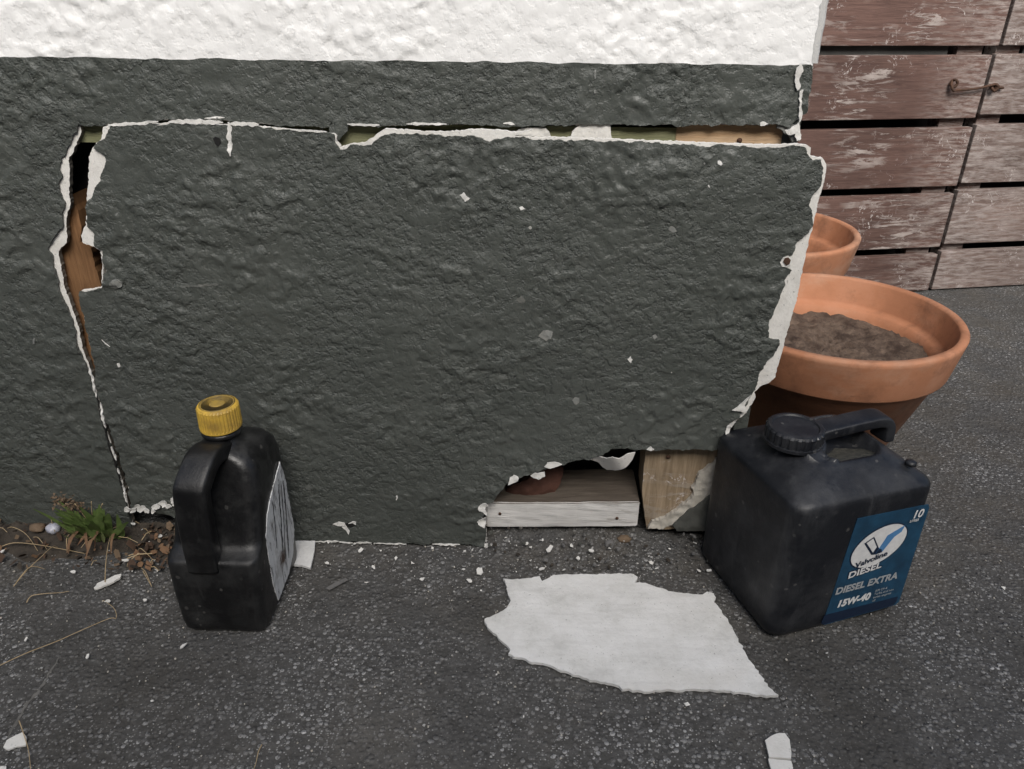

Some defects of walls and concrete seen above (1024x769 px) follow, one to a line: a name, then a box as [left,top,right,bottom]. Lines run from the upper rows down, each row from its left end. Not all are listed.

crack [108,116,259,156]
crack [290,123,379,133]
crack [408,120,447,128]
crack [503,122,612,138]
peeling [725,395,751,434]
crack [89,367,128,507]
spalling [508,462,562,485]
spalling [477,503,488,548]